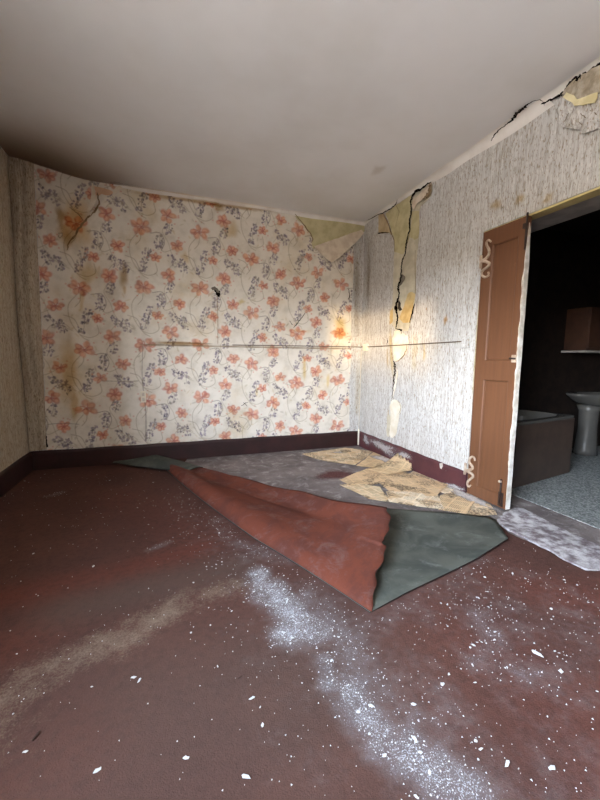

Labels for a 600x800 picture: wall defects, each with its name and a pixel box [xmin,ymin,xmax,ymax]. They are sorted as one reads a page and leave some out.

crack [491,62,600,141]
flaking render [563,92,598,106]
flaking render [378,196,419,254]
crack [368,182,431,333]
flaking render [390,292,415,324]
crack [391,361,399,399]